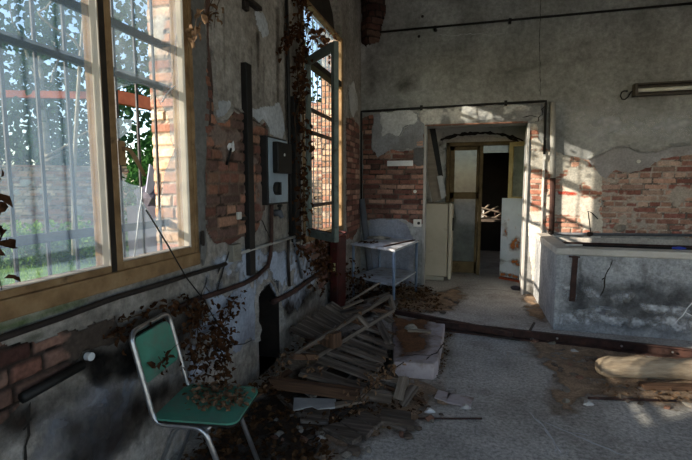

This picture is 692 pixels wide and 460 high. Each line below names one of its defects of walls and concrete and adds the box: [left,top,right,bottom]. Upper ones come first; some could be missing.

spalling [361,0,386,48]
flaking render [205,0,285,245]
flaking render [346,81,424,240]
crack [440,131,524,142]
flaking render [528,123,692,285]
damp [559,282,692,331]
flaking render [0,316,120,424]